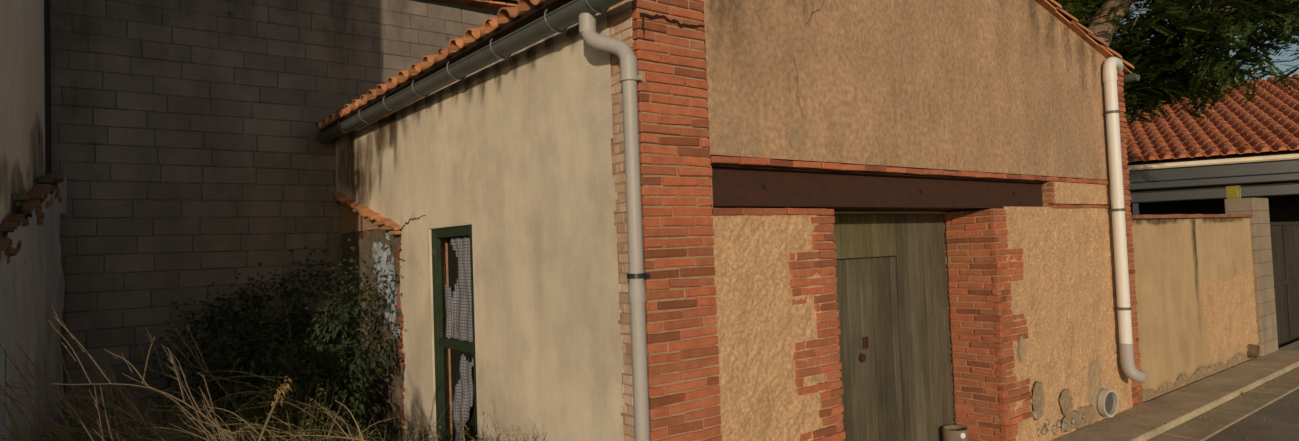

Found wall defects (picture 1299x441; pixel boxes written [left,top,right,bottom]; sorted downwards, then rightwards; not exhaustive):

water stain [338,97,430,204]
spalling [0,173,64,265]
spalling [341,227,405,441]
spalling [1030,381,1097,436]